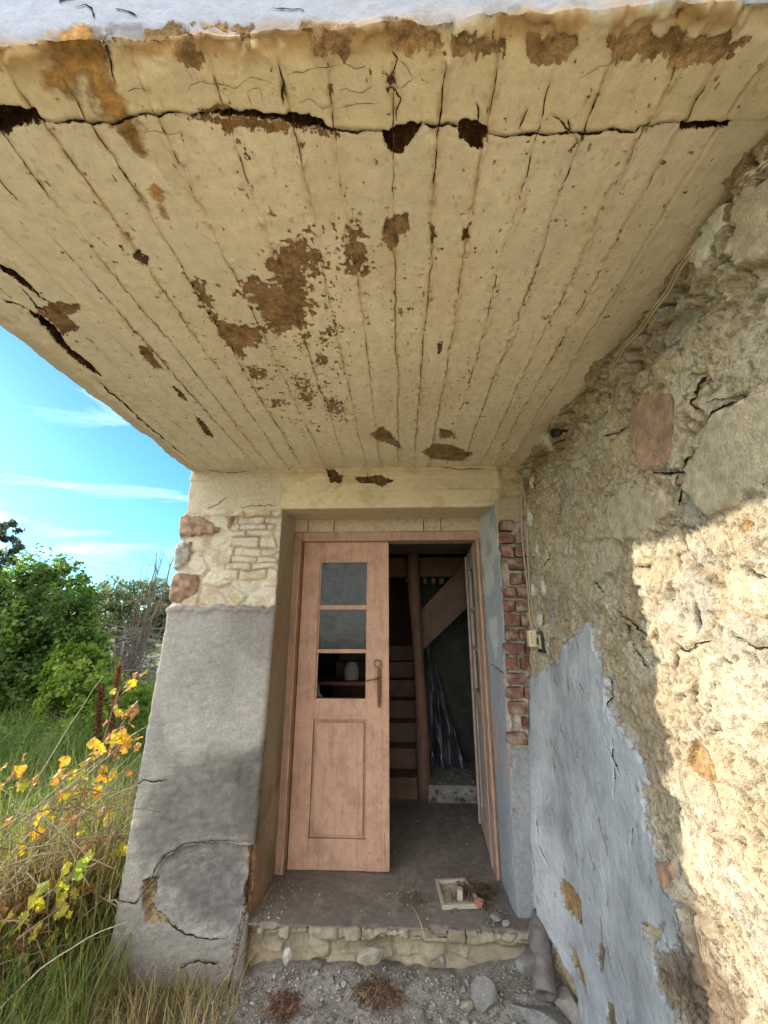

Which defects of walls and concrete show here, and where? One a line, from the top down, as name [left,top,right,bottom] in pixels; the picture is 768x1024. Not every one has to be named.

crack [0,4,730,208]
spalling [525,21,589,73]
spalling [607,7,752,90]
peeling [20,282,126,351]
crack [0,265,182,454]
peeling [125,187,525,487]
crack [52,221,618,509]
crack [689,373,747,419]
crack [652,449,697,505]
peeling [498,520,683,1024]
crack [119,840,248,968]
spalling [140,845,255,939]